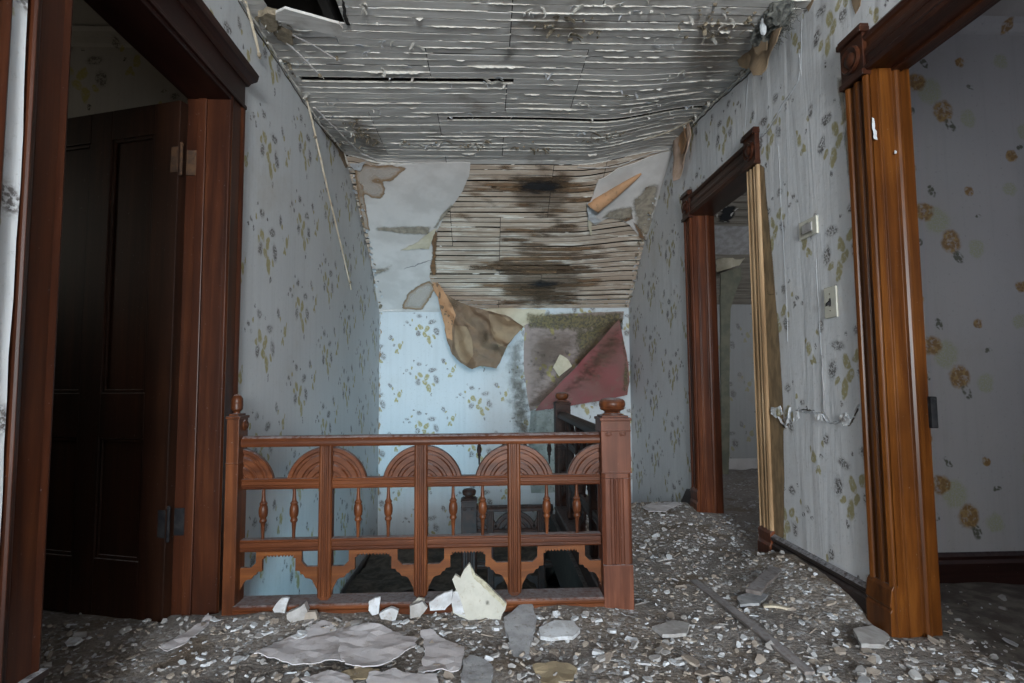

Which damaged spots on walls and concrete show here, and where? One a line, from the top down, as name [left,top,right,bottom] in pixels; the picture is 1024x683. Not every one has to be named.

peeling [523,0,666,42]
peeling [651,2,757,48]
peeling [318,99,380,168]
water stain [604,186,657,241]
water stain [471,167,621,355]
water stain [512,347,526,432]